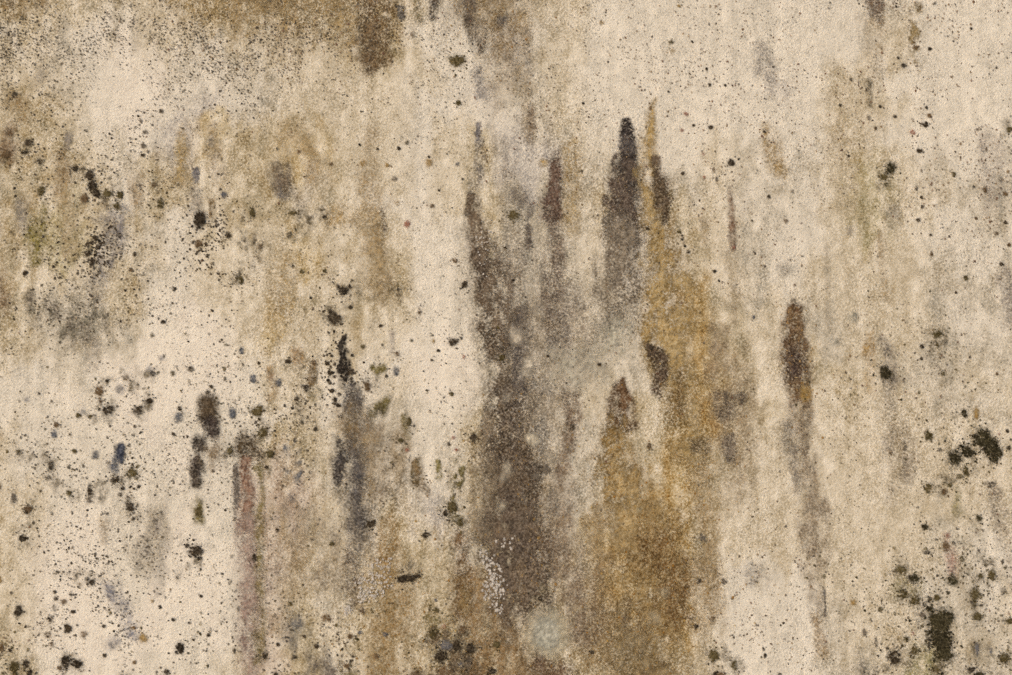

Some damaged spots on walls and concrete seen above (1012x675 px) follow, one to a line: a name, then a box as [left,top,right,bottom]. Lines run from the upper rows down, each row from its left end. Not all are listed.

leakage [681,293,1012,675]